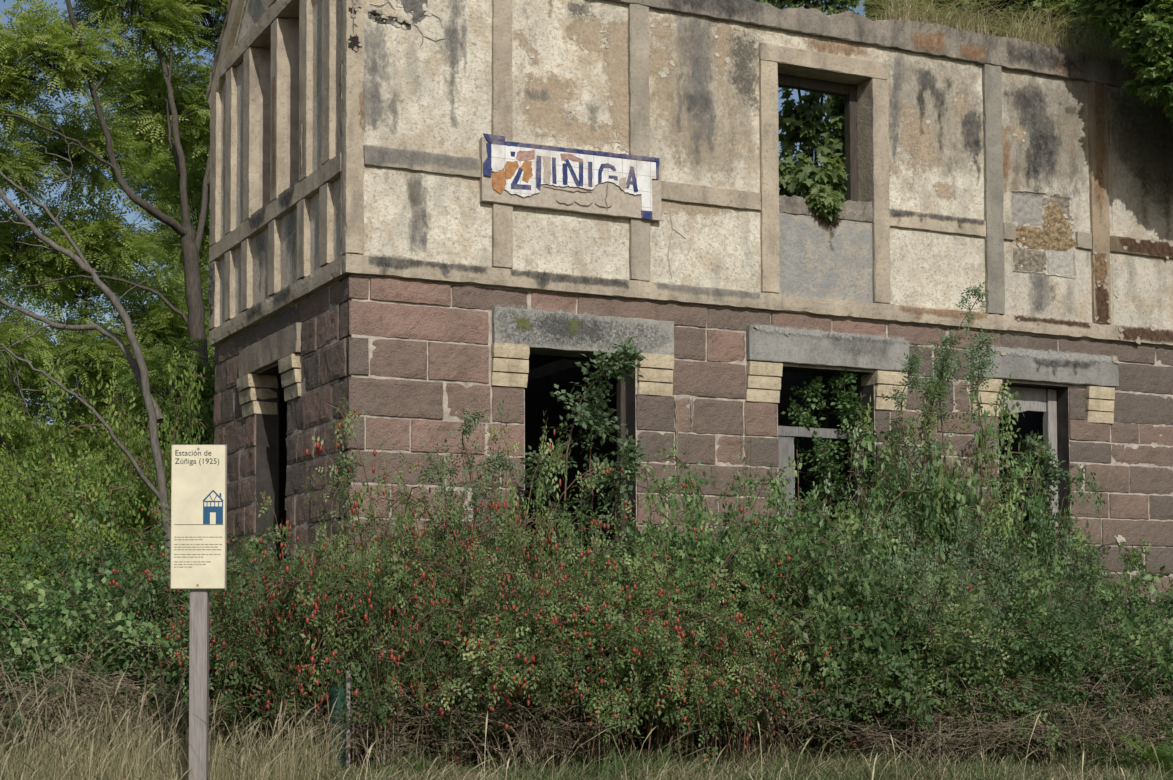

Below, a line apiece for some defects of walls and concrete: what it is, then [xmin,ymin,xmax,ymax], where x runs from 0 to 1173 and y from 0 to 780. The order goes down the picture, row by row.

spalling [355,0,432,30]
crack [351,0,446,47]
leakage [446,0,467,67]
crack [338,64,365,133]
leakage [364,27,396,129]
leakage [890,62,901,159]
leakage [918,70,951,149]
leakage [962,112,981,174]
leakage [1005,86,1062,192]
leakage [367,146,476,246]
leakage [370,255,486,277]
spalling [1012,194,1076,275]